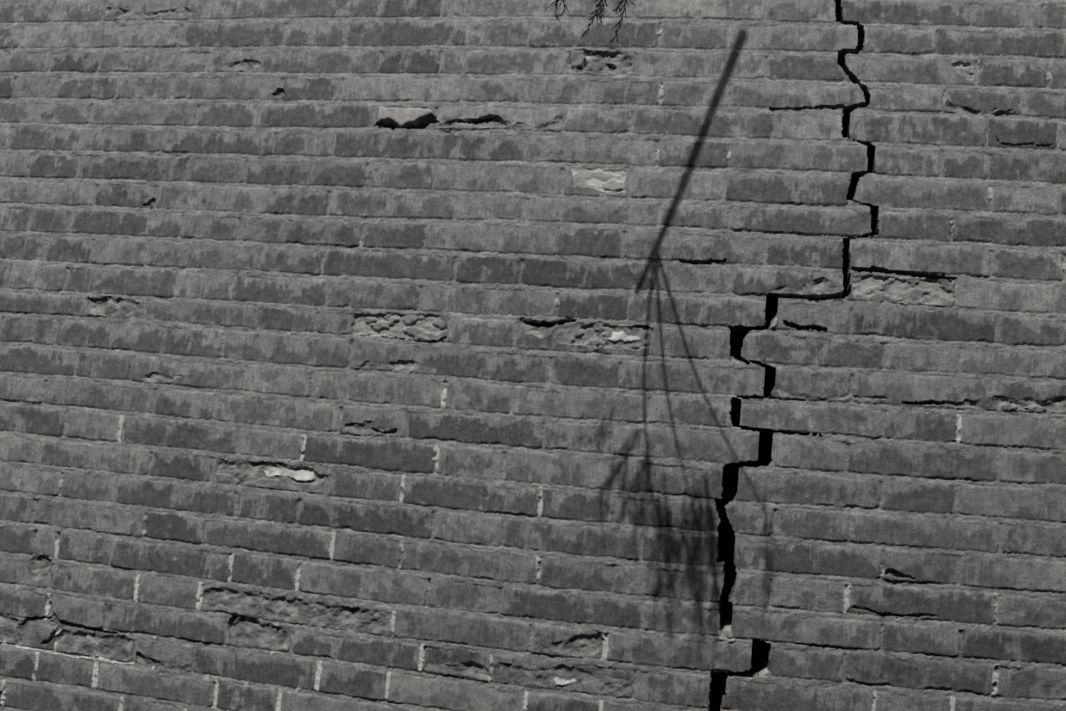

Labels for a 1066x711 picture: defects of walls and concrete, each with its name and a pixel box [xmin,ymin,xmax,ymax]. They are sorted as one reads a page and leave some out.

spalling [566,48,636,79]
spalling [374,106,567,133]
peeling [770,274,955,308]
peeling [351,312,449,344]
peeling [516,317,651,351]
crack [708,0,957,711]
spalling [210,458,338,493]